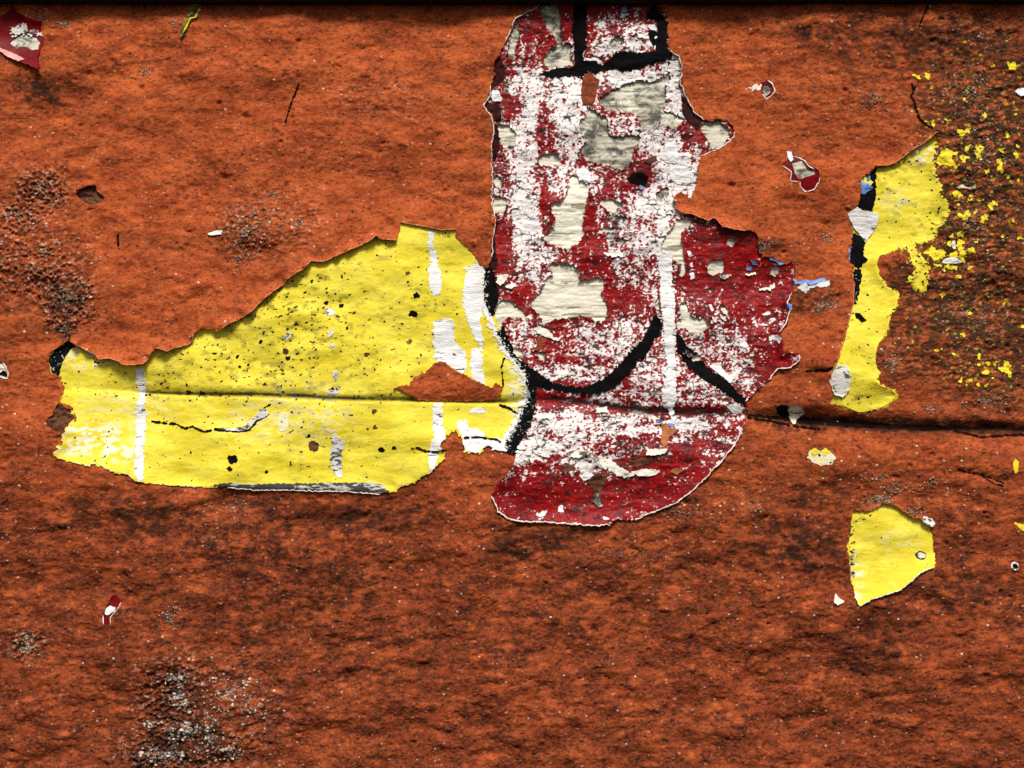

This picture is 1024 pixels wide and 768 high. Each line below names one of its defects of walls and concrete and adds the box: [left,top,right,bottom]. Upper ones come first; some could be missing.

peeling [0,5,45,70]
peeling [829,36,1024,415]
peeling [46,4,830,527]
peeling [807,447,836,466]
crack [747,414,1024,439]
peeling [834,504,936,606]
peeling [102,595,122,625]